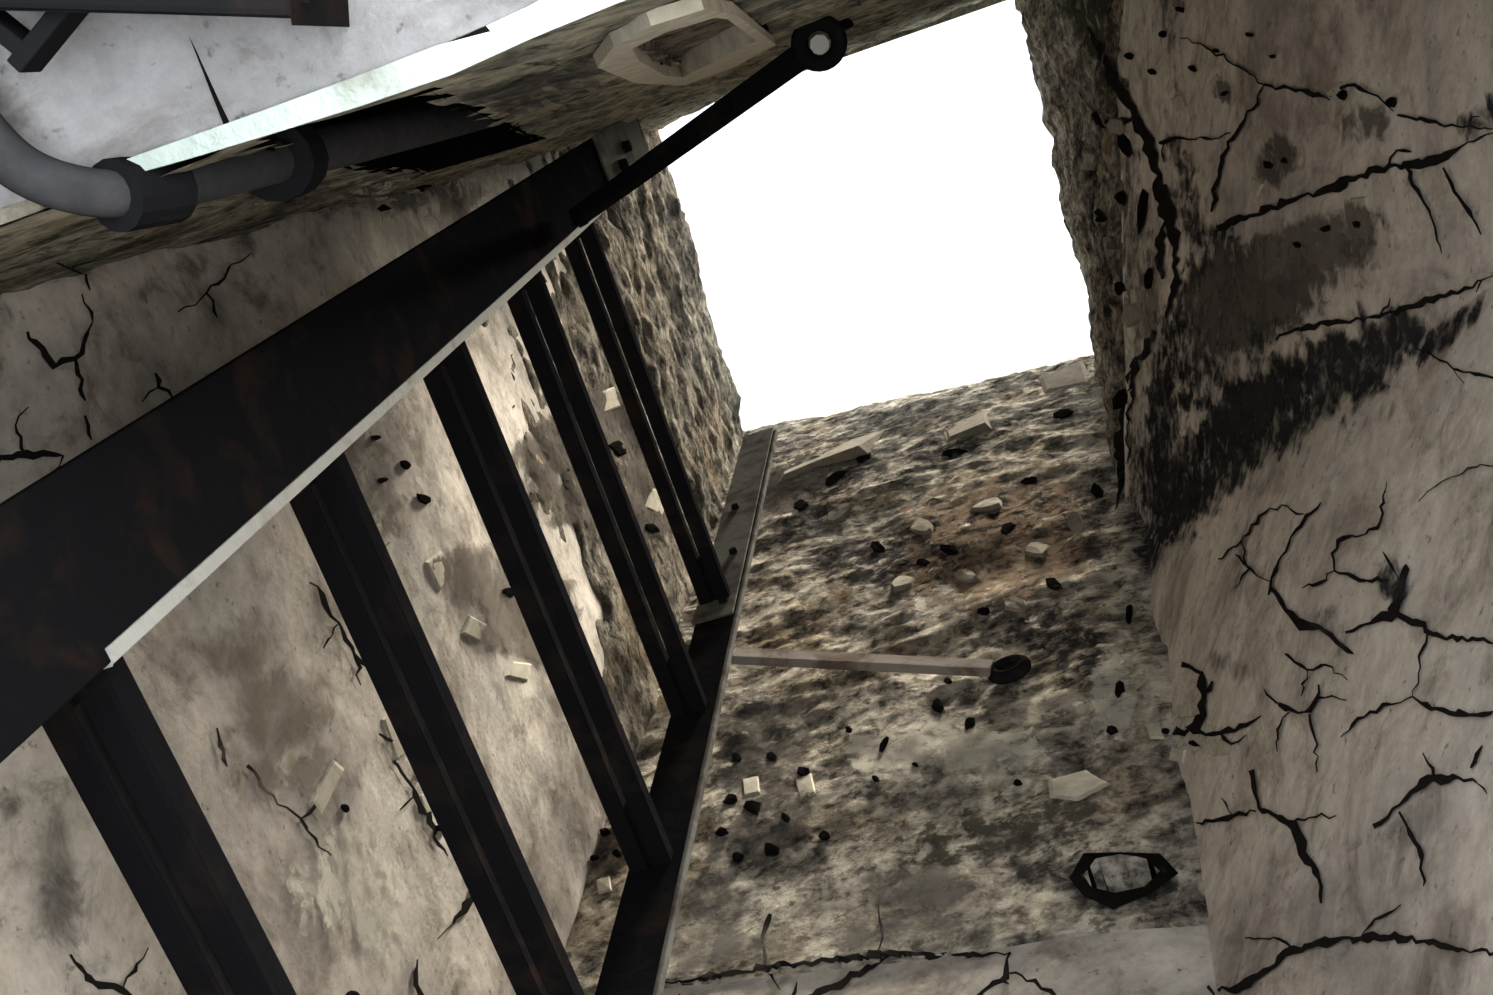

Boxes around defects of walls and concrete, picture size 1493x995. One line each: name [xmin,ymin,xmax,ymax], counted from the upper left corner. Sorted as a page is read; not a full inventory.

crack [0,261,94,468]
crack [142,373,173,402]
damp [761,425,1073,549]
damp [811,134,1482,621]
crack [1087,26,1493,510]
damp [838,707,1117,951]
crack [1172,464,1493,995]
crack [69,948,149,995]
crack [665,901,1057,995]